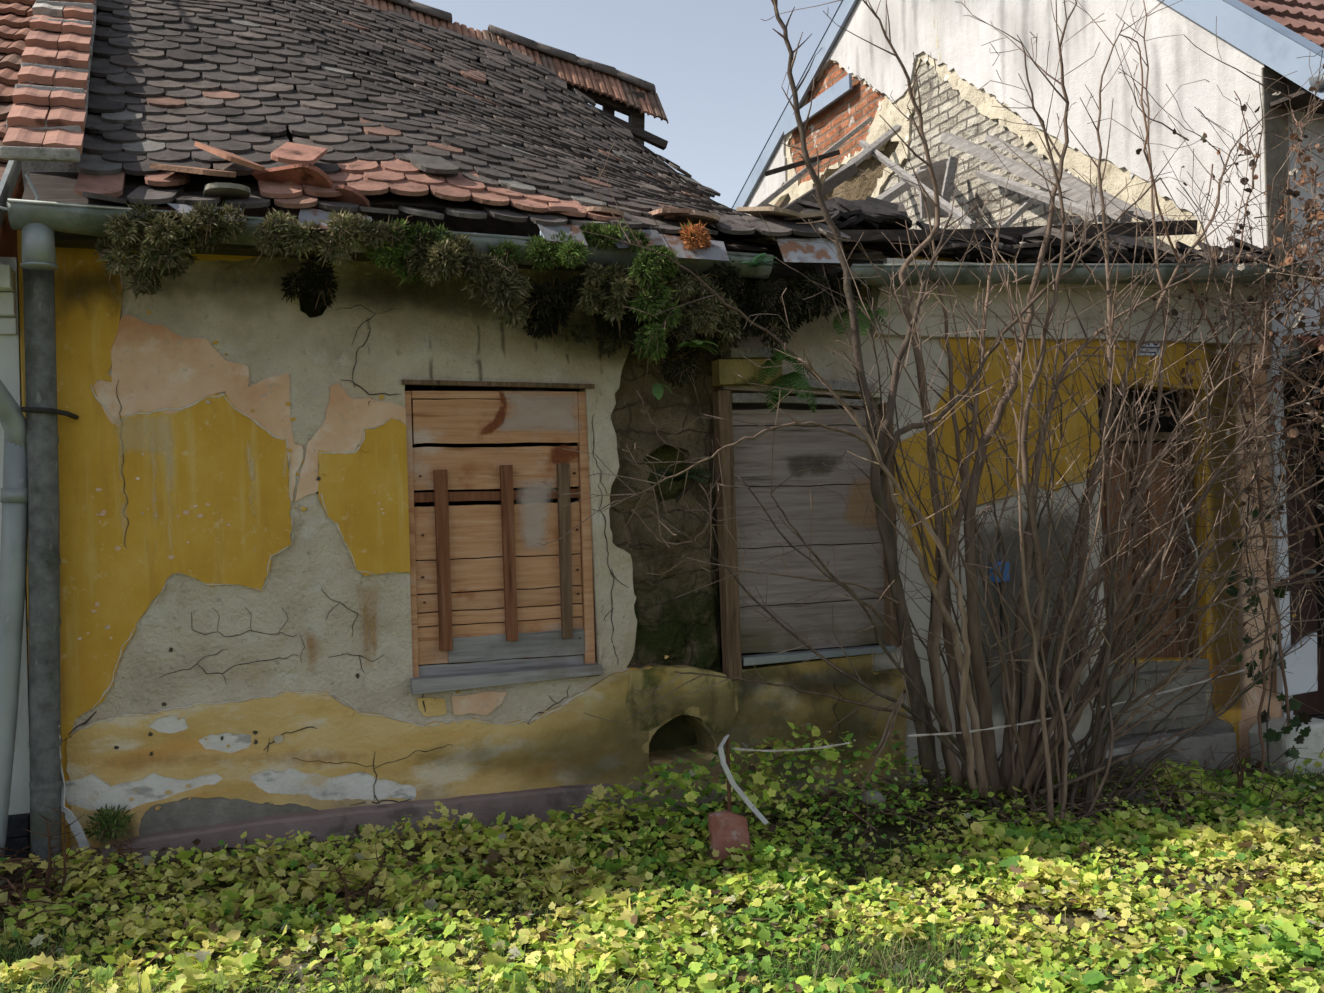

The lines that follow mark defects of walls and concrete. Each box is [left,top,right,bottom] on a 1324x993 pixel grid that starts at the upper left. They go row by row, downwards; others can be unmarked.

spalling [768,52,1205,251]
spalling [726,238,781,255]
crack [337,305,399,406]
spalling [59,257,1106,870]
crack [159,589,383,684]